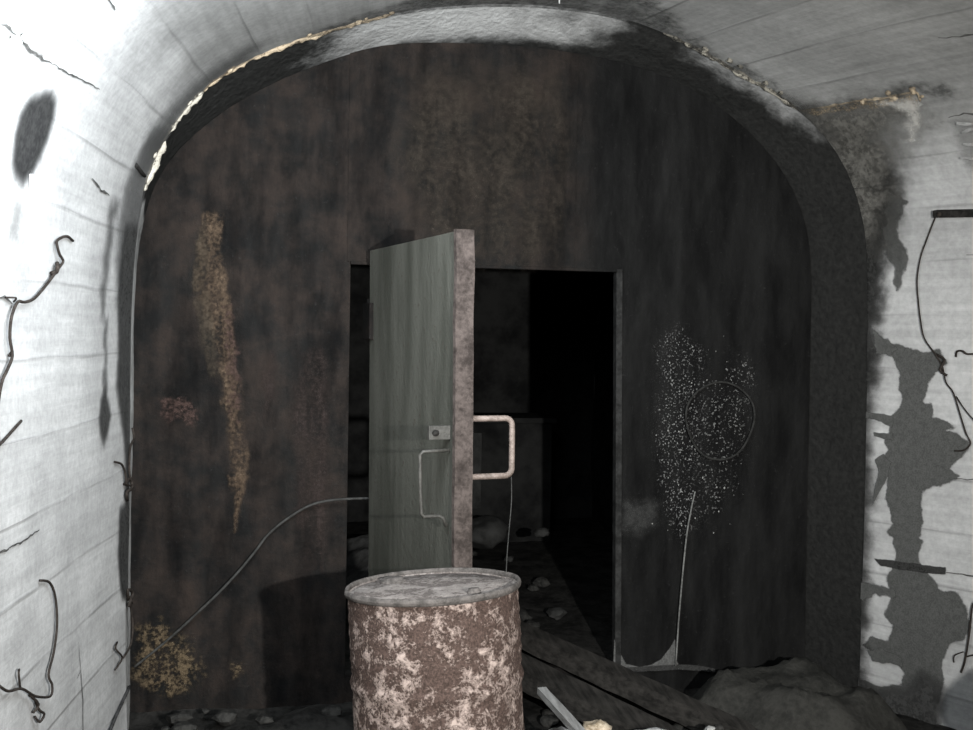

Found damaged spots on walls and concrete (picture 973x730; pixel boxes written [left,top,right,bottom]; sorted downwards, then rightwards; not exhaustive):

crack [1,24,100,90]
spalling [144,12,395,191]
spalling [663,33,924,238]
leakage [882,192,908,290]
rust [195,215,246,515]
leakage [656,338,749,535]
crack [0,530,39,553]
rust [136,625,197,695]